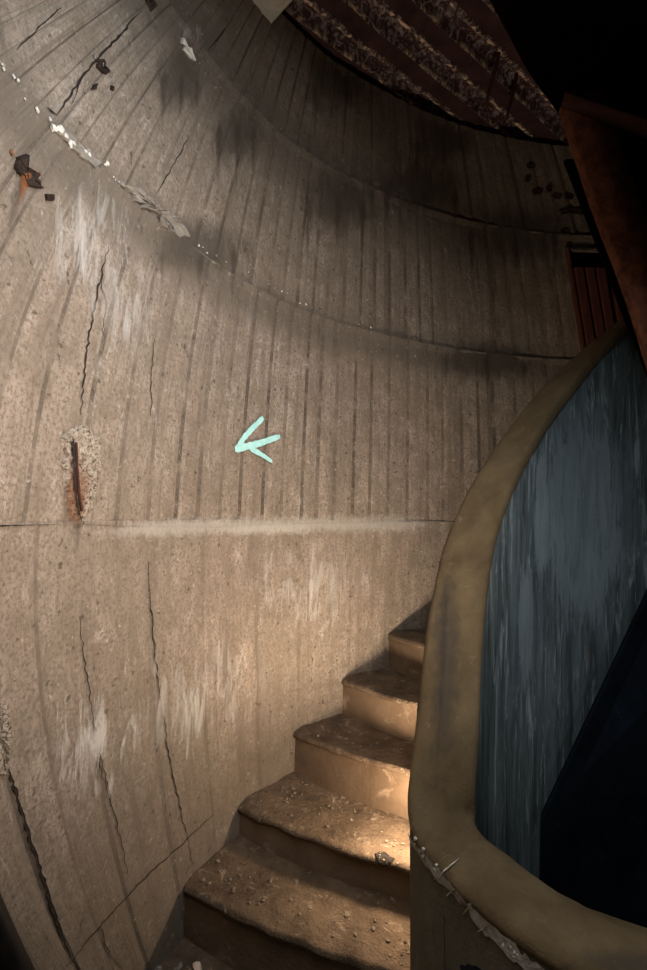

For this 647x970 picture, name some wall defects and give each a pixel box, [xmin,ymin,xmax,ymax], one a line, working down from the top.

crack [8,563,212,970]
spalling [408,834,544,970]